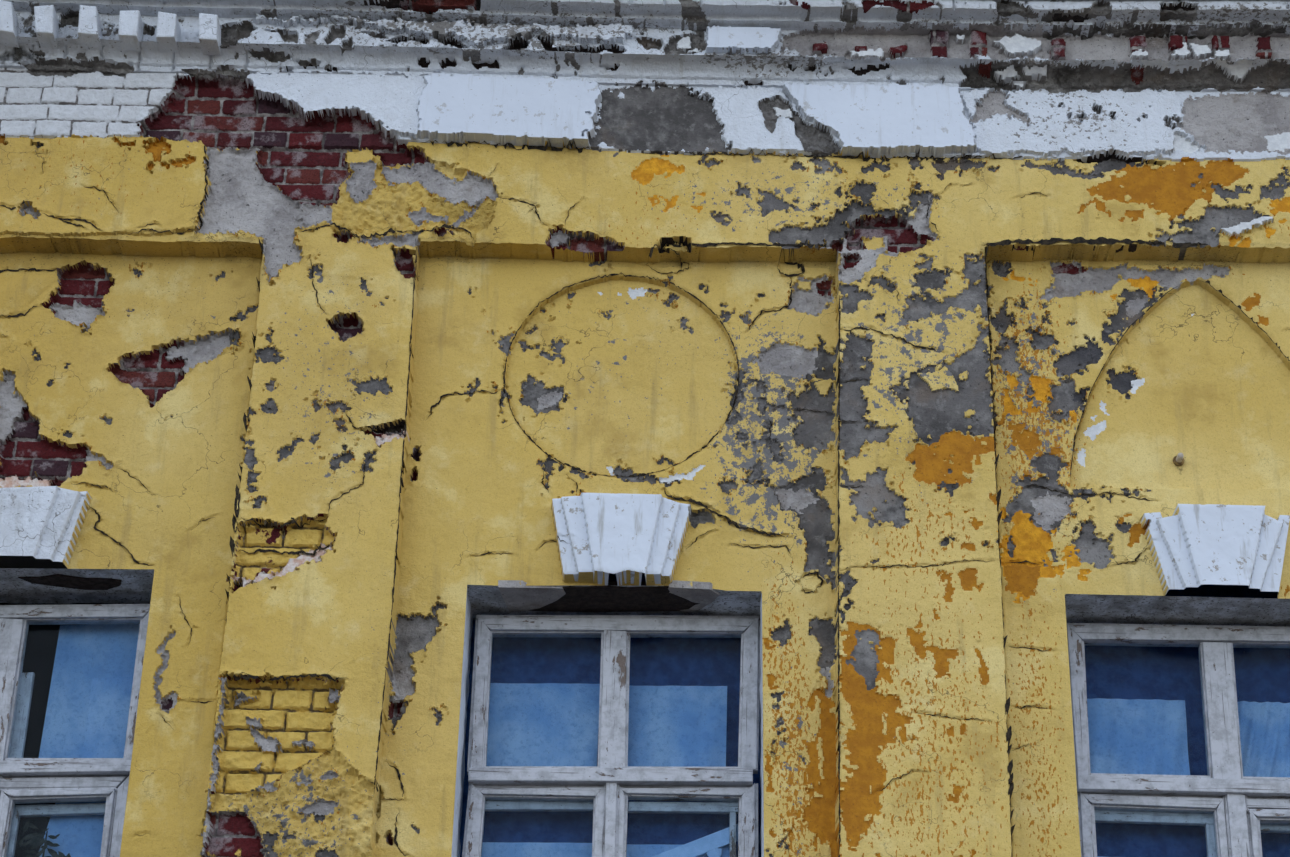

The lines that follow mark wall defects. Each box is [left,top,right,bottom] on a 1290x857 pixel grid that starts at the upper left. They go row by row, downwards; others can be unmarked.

crack [0,143,209,235]
spalling [114,20,499,283]
peeling [368,29,732,226]
spalling [0,369,113,488]
spalling [42,260,115,333]
crack [71,468,150,566]
spalling [108,305,258,408]
spalling [226,380,336,593]
spalling [498,580,720,612]
crack [190,222,1290,857]
peeling [718,0,1290,697]
spalling [200,674,393,857]